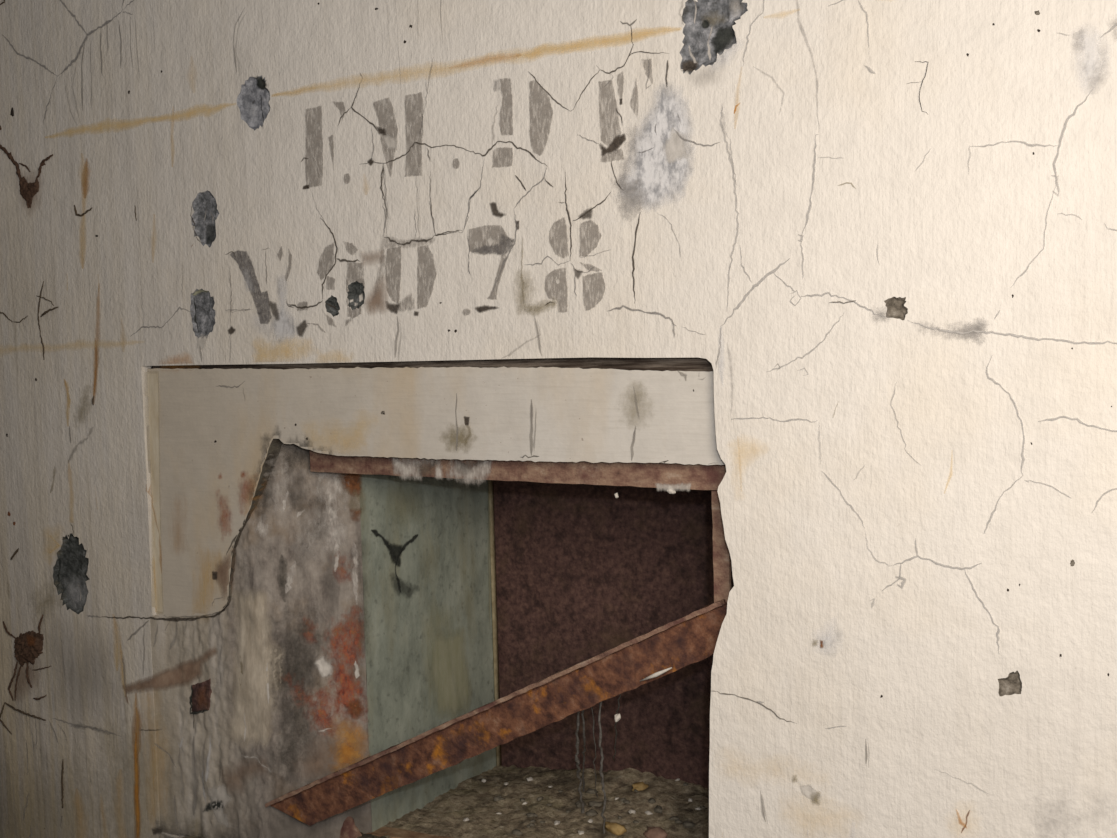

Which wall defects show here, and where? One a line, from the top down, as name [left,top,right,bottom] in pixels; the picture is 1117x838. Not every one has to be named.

spalling [680,0,748,74]
spalling [237,76,271,131]
crack [289,194,359,309]
crack [338,19,1117,533]
corrosion [344,473,362,515]
peeling [393,457,490,483]
spalling [53,522,89,614]
crack [823,472,1000,652]
corrosion [122,650,216,838]
peeling [230,593,281,742]
corrosion [312,622,362,769]
crack [717,691,797,724]